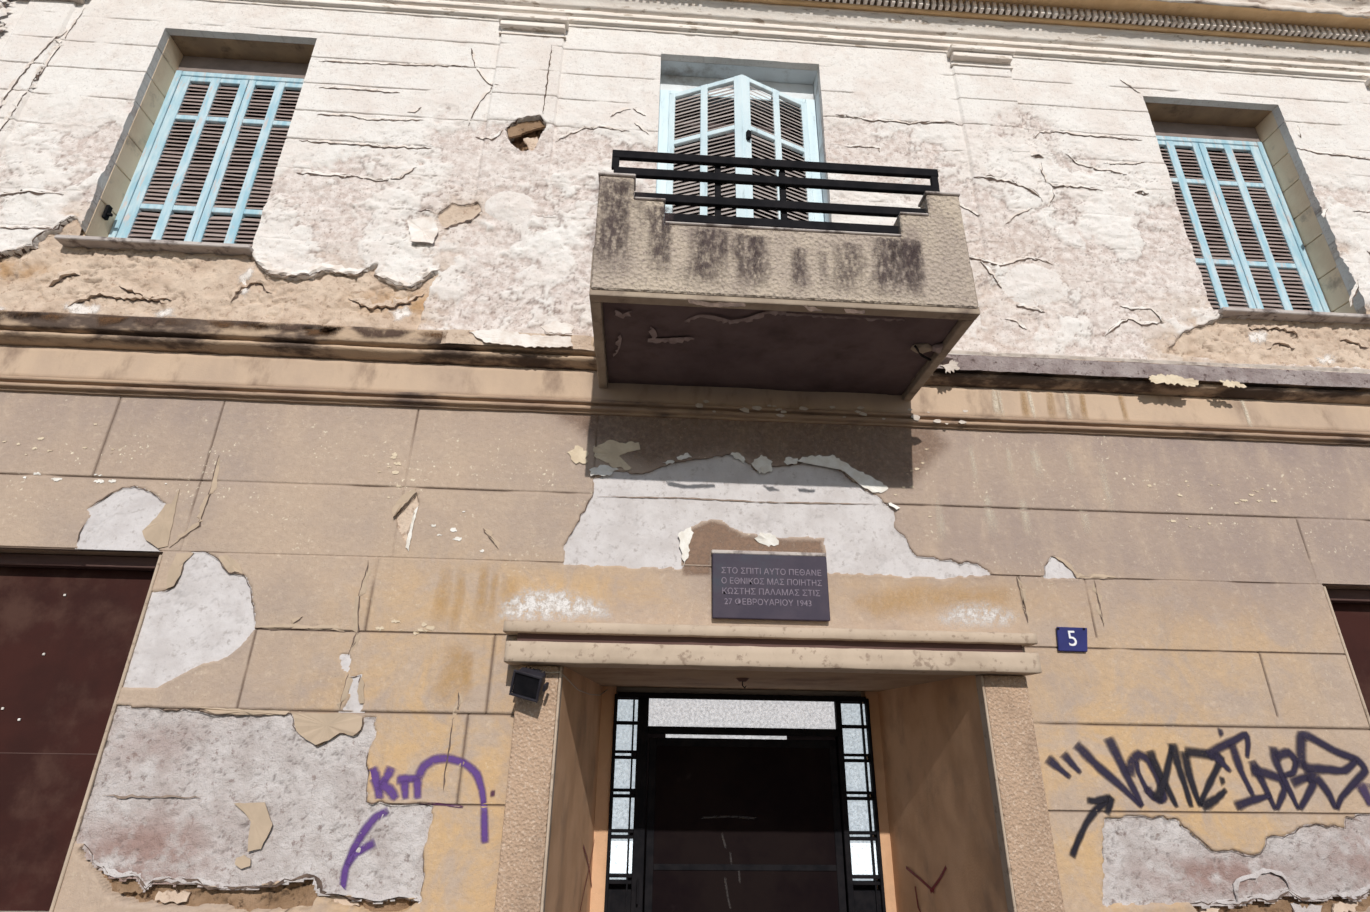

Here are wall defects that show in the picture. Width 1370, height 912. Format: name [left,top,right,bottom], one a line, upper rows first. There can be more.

crack [0,8,85,130]
crack [0,188,71,259]
flaking render [0,219,438,330]
leakage [600,180,627,257]
leakage [648,207,667,258]
leakage [689,229,765,277]
leakage [878,239,920,285]
crack [969,256,1053,330]
crack [960,129,1144,224]
peeling [563,440,991,579]
peeling [75,474,256,688]
flaking render [76,654,434,912]